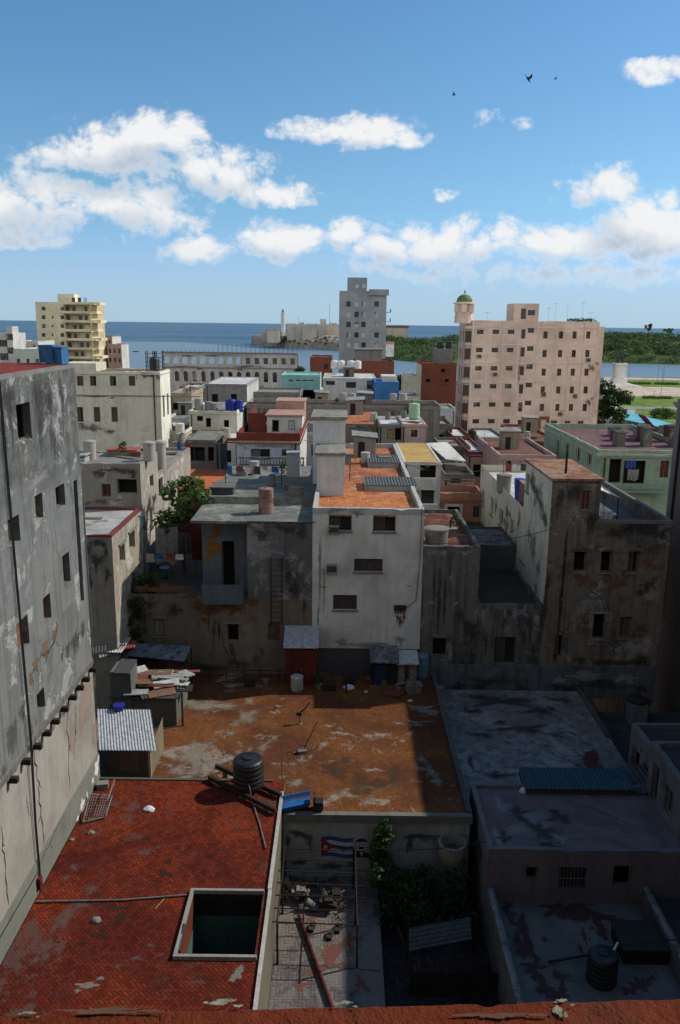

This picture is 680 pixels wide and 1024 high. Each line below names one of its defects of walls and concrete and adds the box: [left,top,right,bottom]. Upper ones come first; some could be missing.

water stain [10,382,68,498]
flaking render [112,543,307,624]
flaking render [29,620,58,687]